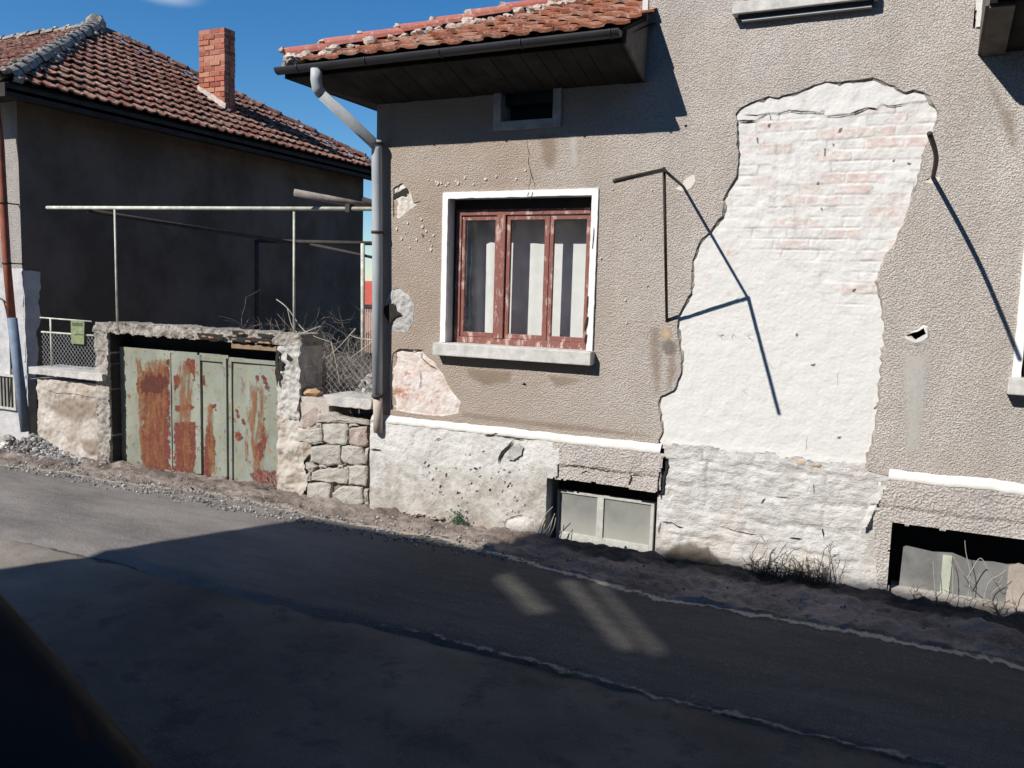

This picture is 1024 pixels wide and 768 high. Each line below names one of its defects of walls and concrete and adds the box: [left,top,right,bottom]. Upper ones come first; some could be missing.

flaking render [393,183,434,251]
corrosion [136,358,216,477]
corrosion [235,375,277,486]
flaking render [390,348,461,416]
flaking render [656,77,940,591]